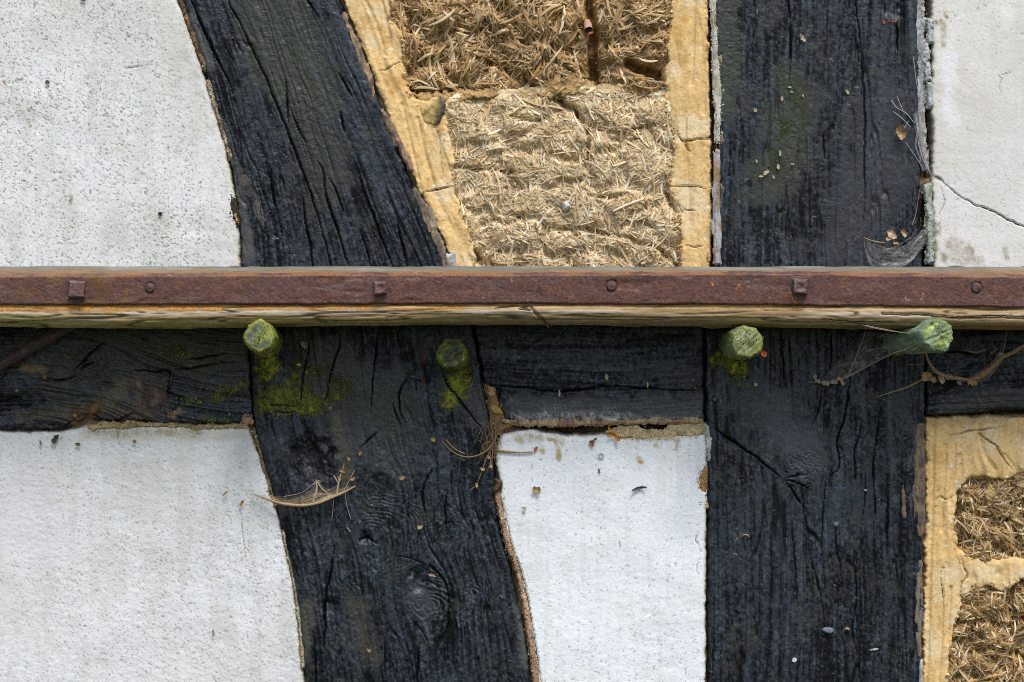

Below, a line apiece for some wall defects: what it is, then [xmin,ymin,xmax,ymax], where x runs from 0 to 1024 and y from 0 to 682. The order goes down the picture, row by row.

peeling [381,108,414,171]
spalling [388,0,683,267]
crack [927,175,1024,227]
spalling [953,472,1024,565]
spalling [945,579,1024,682]